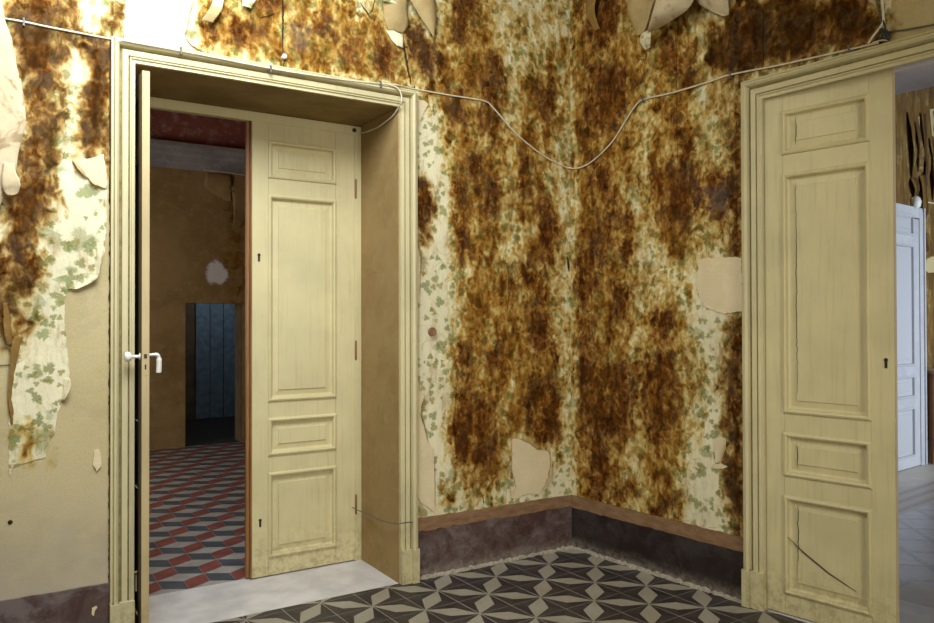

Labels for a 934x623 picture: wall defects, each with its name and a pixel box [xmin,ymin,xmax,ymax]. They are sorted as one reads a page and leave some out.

leakage [0,0,125,343]
peeling [72,154,107,188]
leakage [198,0,892,537]
peeling [697,257,742,314]
peeling [926,256,934,273]
spalling [93,449,101,471]
peeling [511,438,552,499]